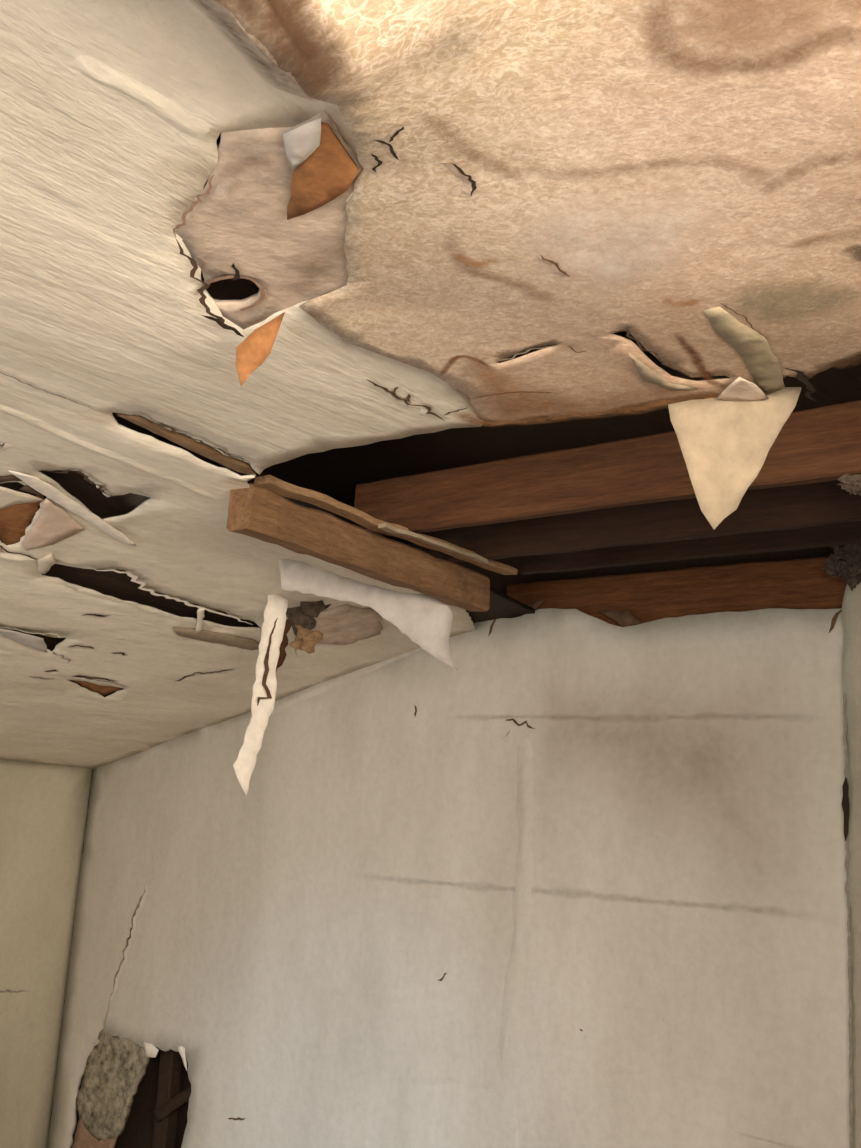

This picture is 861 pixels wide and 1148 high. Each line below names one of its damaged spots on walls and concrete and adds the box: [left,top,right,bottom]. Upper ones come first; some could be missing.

water stain [199,0,343,90]
flaking render [173,110,363,337]
water stain [548,211,688,277]
crack [360,379,467,421]
water stain [441,338,723,425]
peeling [0,487,85,574]
peeling [195,608,205,633]
crack [103,885,148,1031]
spalling [72,1029,159,1148]
spalling [152,1086,191,1122]
spalling [176,1045,187,1071]